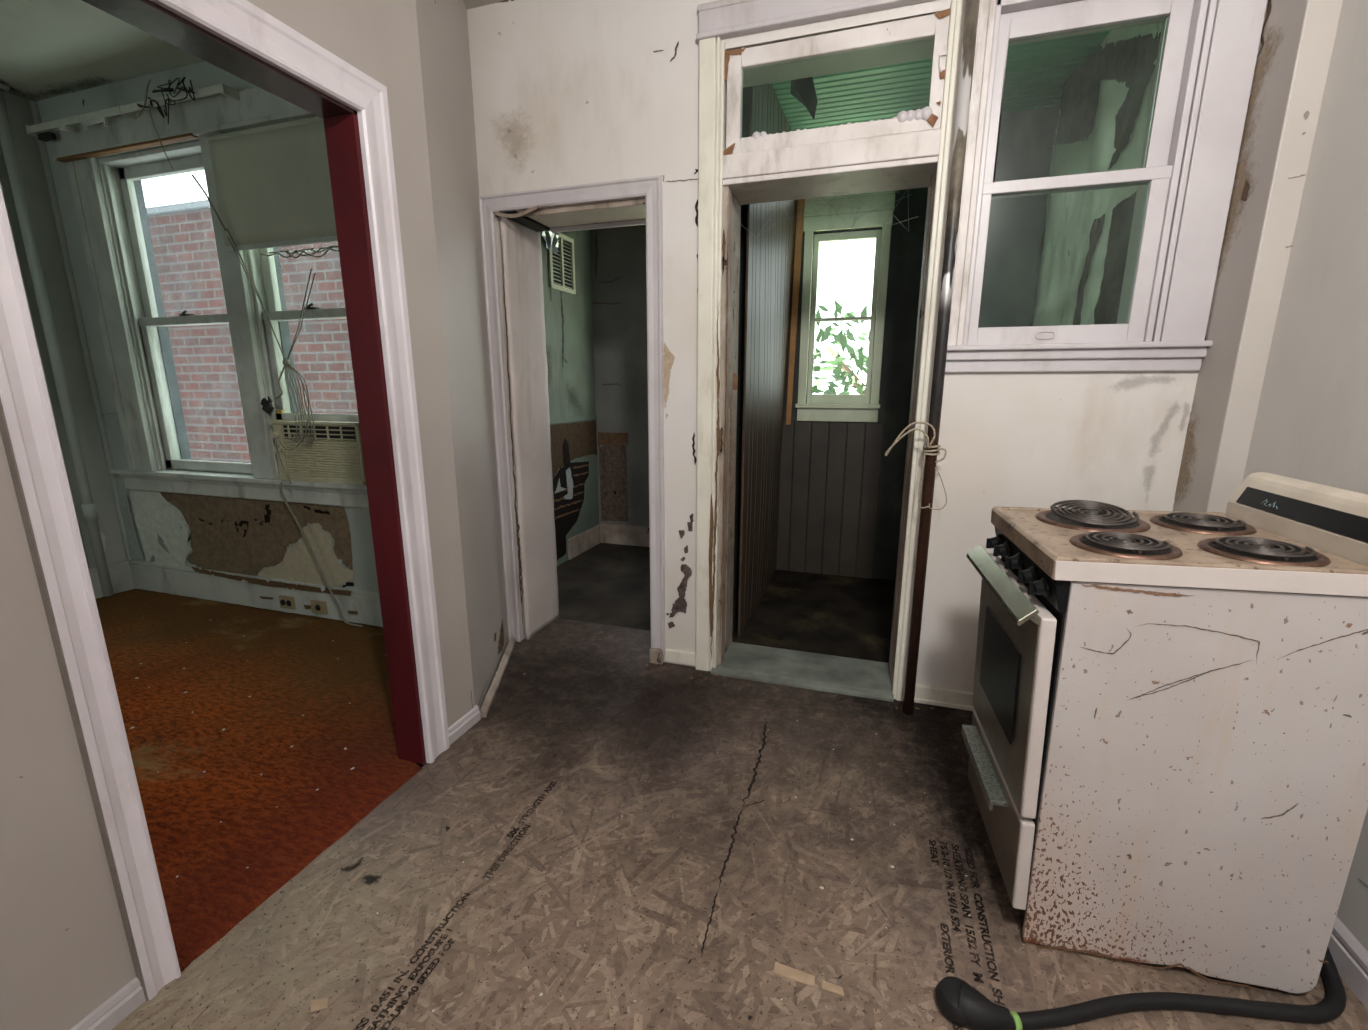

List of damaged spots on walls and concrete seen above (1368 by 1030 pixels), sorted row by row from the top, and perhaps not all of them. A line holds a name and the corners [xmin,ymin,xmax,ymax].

peeling [709,197,738,659]
flaking render [130,489,358,615]
spalling [666,513,693,629]